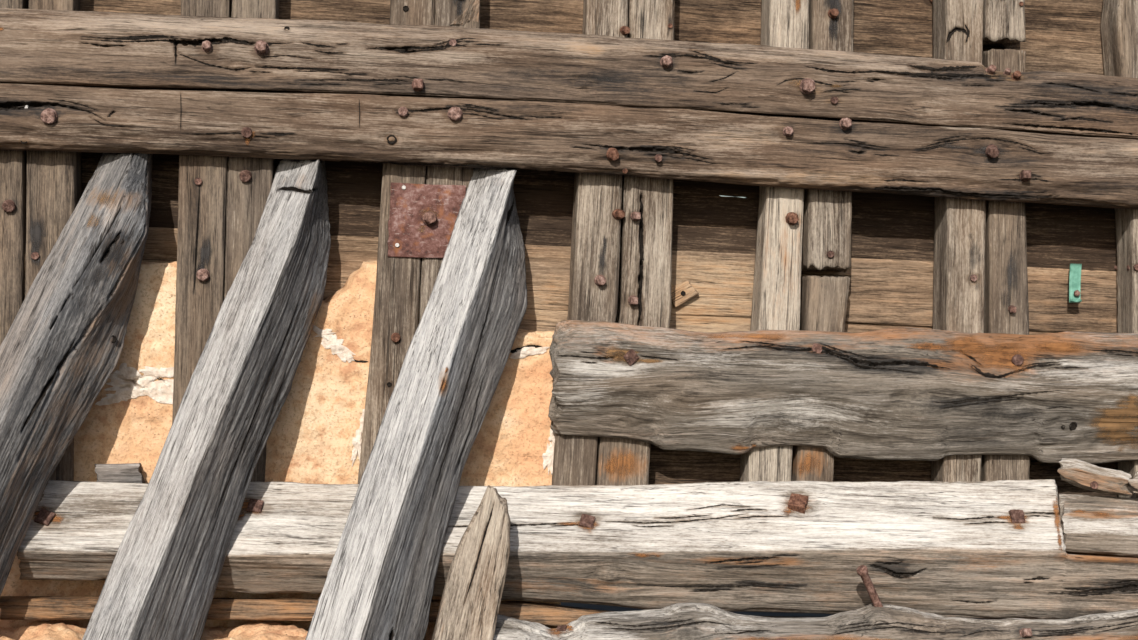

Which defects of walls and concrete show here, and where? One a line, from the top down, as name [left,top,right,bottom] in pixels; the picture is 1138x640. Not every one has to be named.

crack [81,35,574,126]
crack [778,25,1138,199]
crack [574,144,720,164]
spalling [313,325,356,363]
corrosion [911,337,1079,369]
spalling [96,363,174,406]
crack [727,341,1138,409]
corrosion [1093,395,1138,445]
crack [873,562,925,578]